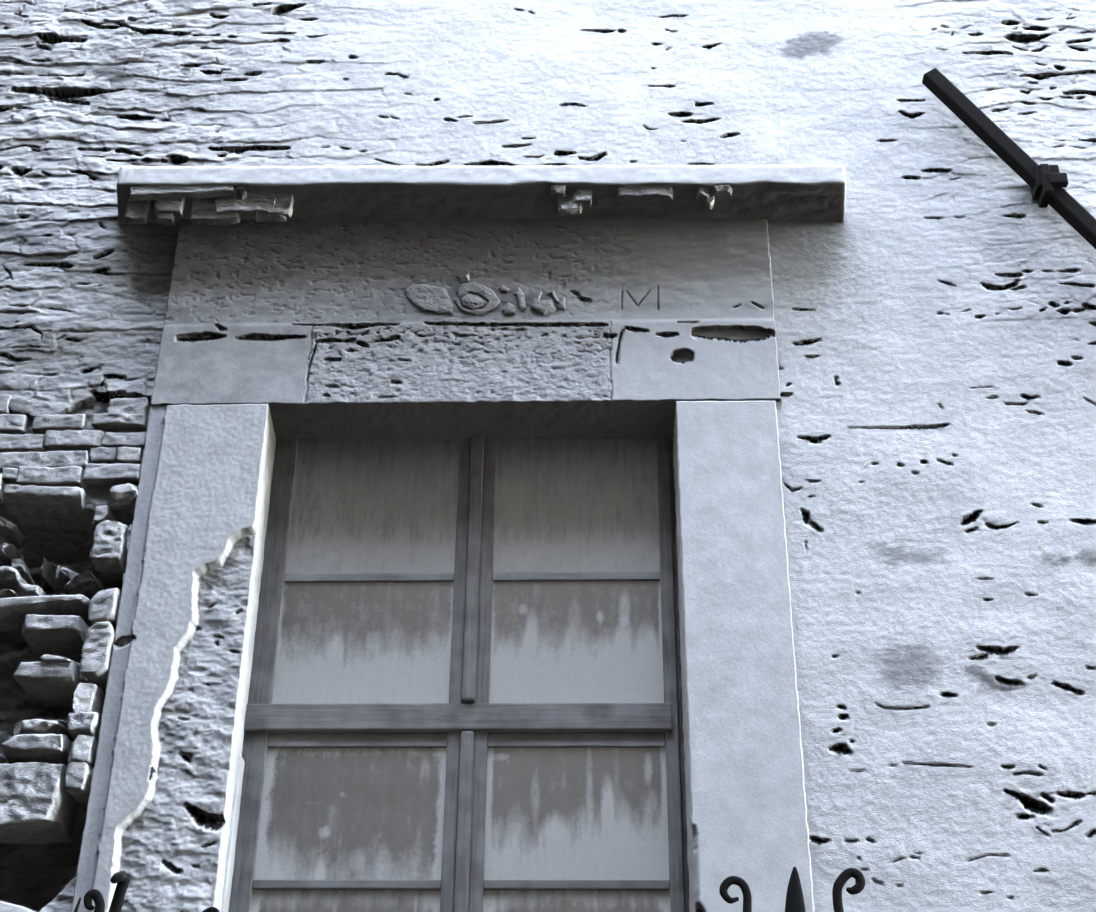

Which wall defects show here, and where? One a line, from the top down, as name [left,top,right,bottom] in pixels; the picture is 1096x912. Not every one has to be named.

spalling [0,473,138,845]